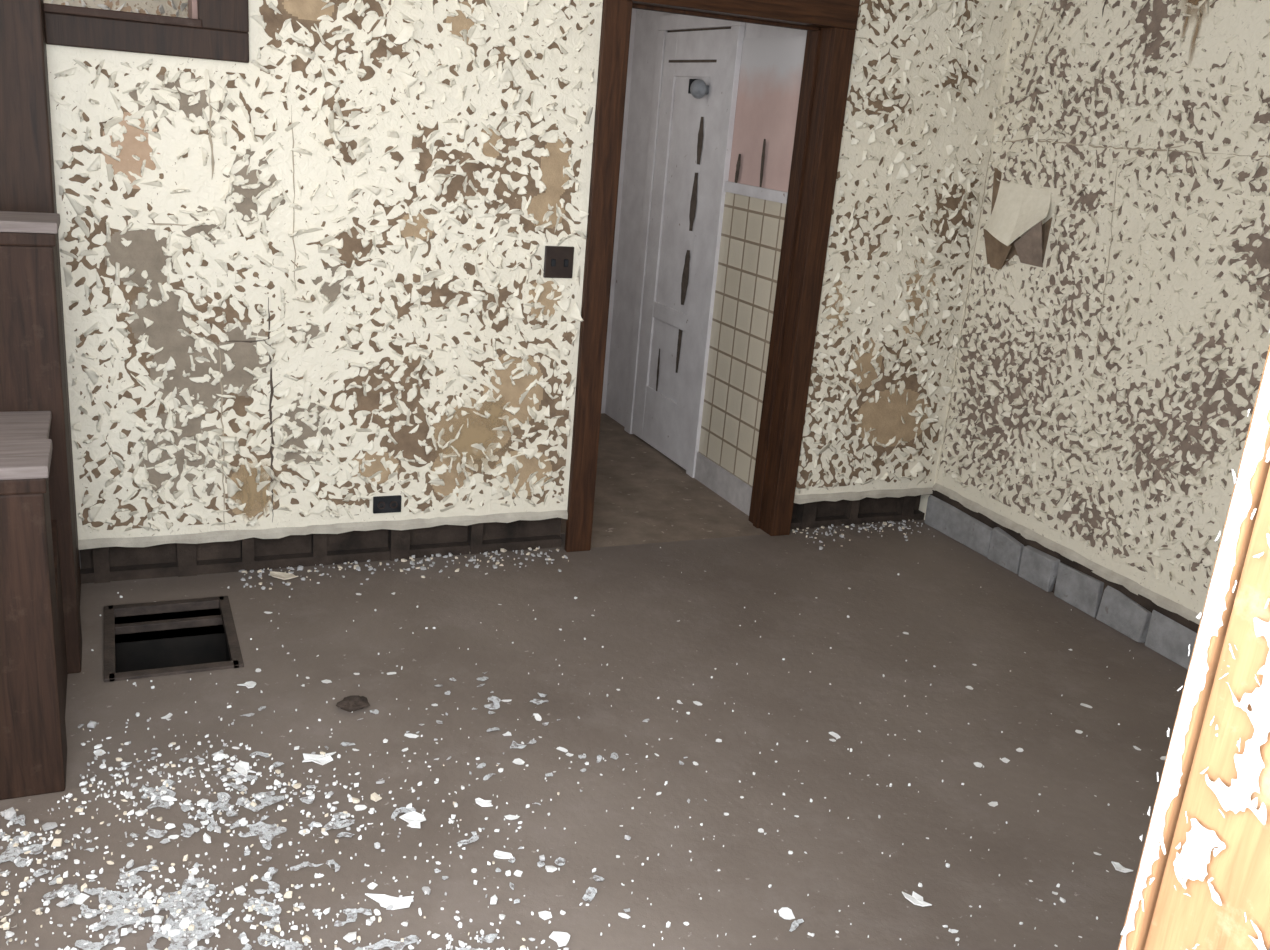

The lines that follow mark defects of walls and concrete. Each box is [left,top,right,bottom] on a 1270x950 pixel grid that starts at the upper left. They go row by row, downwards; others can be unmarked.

peeling [50,0,601,531]
peeling [795,0,1270,950]